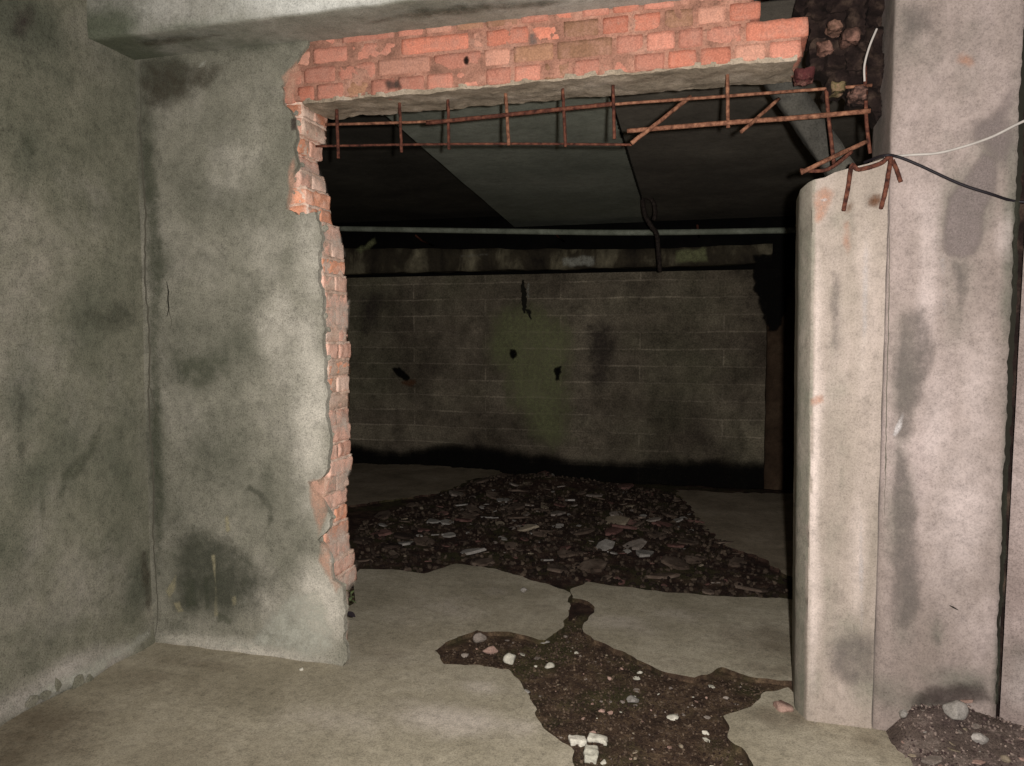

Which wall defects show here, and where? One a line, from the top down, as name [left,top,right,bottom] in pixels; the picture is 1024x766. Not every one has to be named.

spalling [284,0,903,611]